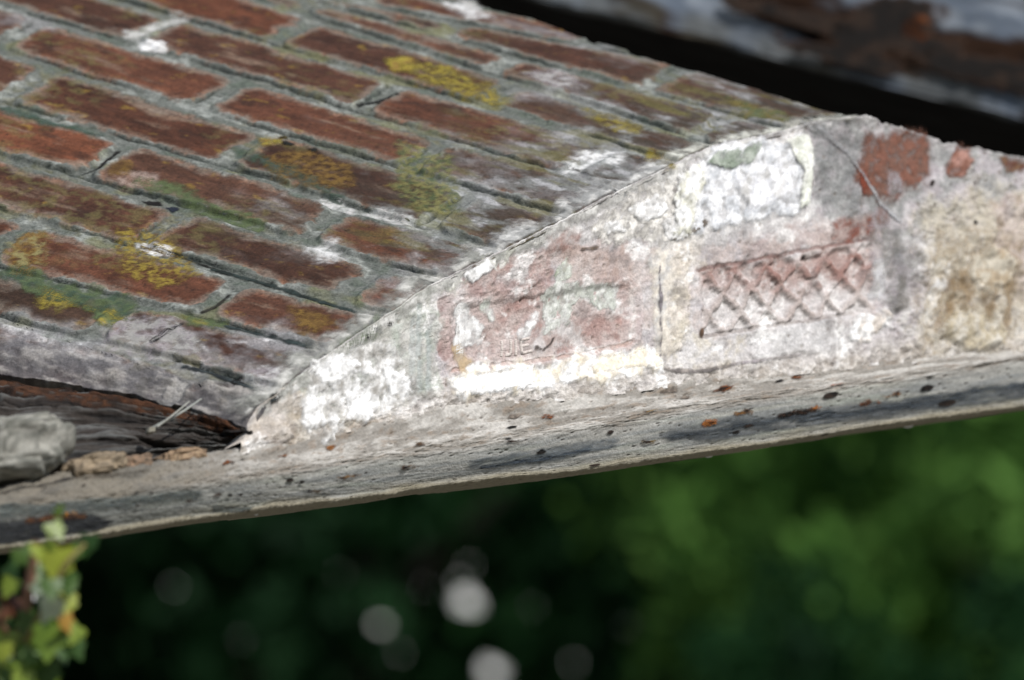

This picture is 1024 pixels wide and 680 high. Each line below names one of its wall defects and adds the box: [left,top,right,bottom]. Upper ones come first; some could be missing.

spalling [832,130,930,243]
rust [778,405,821,417]
damp [663,383,1024,440]